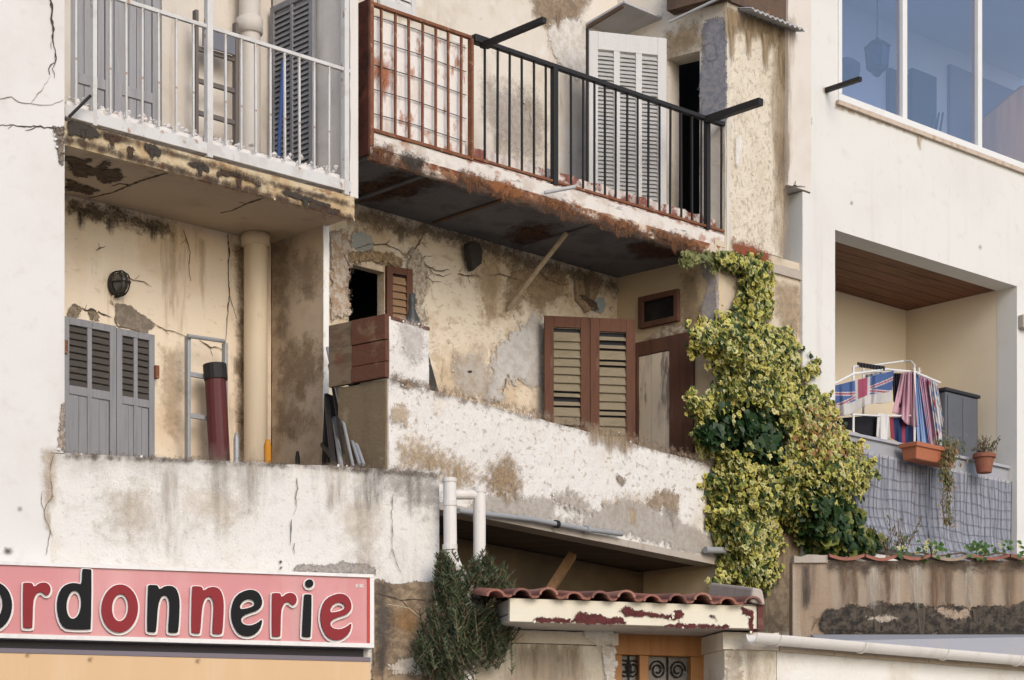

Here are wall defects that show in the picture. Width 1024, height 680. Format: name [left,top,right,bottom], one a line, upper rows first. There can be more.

crack [0,0,64,130]
spalling [67,303,100,321]
spalling [52,125,124,196]
water stain [65,195,172,238]
crack [155,198,263,356]
corrosion [65,120,713,260]
crack [343,232,568,290]
water stain [725,7,791,251]
peeling [389,308,715,468]
crack [41,453,55,554]
peeling [486,473,724,558]
peeling [533,606,731,629]